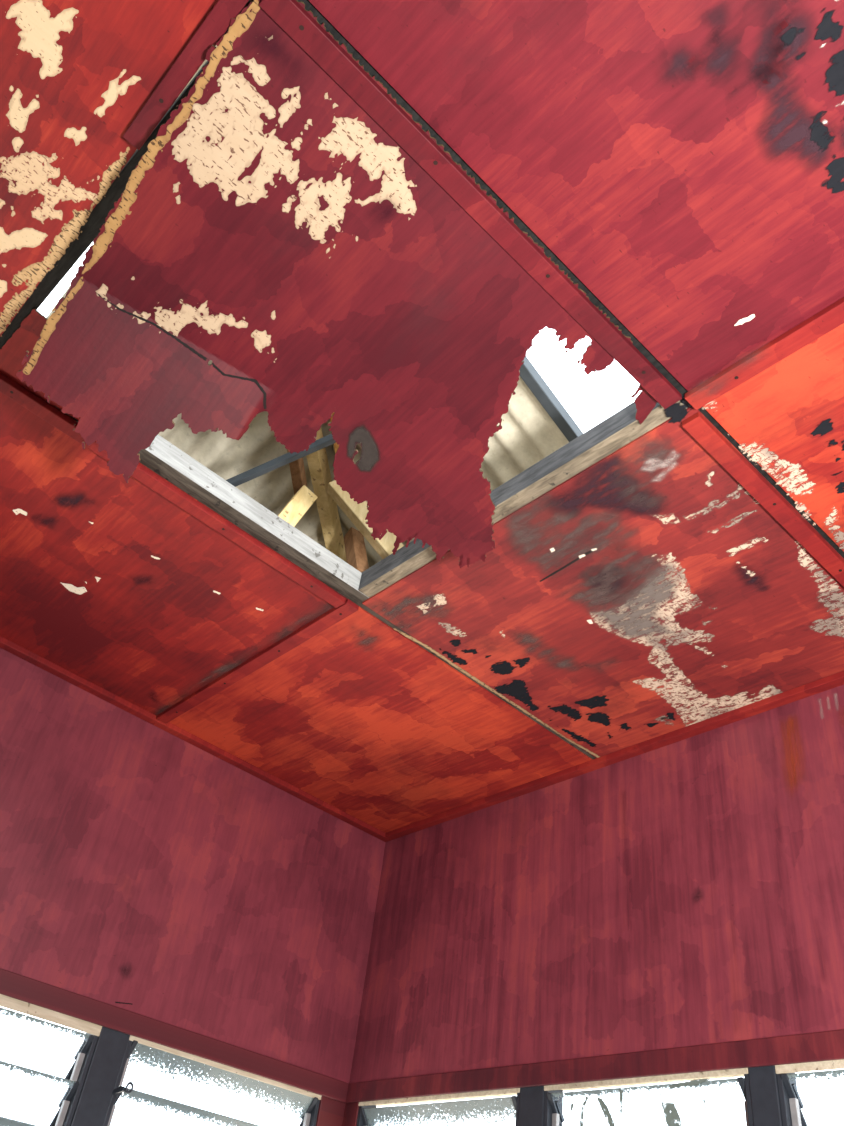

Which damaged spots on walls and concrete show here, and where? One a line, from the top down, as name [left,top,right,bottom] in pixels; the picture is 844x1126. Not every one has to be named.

peeling [6,0,79,79]
peeling [94,69,141,117]
leakage [752,8,844,193]
peeling [0,85,100,298]
peeling [171,55,417,259]
peeling [96,284,277,363]
leakage [811,419,844,493]
peeling [653,481,760,533]
peeling [727,537,768,577]
peeling [795,541,844,637]
peeling [587,553,782,726]
leakage [439,634,675,747]